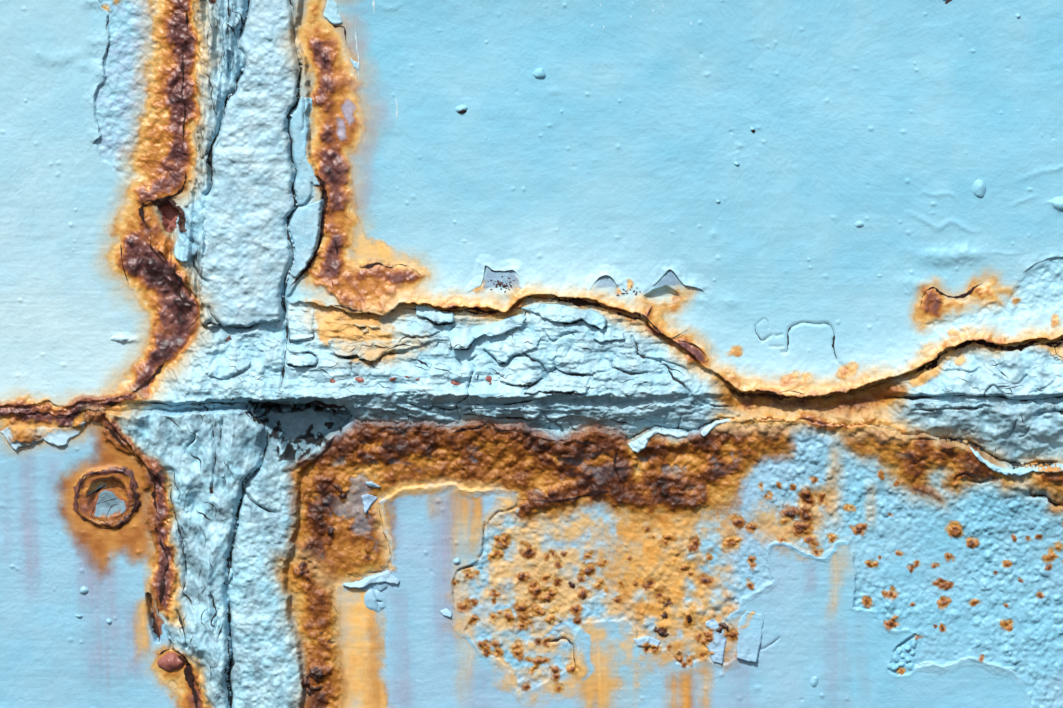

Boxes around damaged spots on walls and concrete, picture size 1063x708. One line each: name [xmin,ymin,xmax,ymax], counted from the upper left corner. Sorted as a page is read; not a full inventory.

peeling [286,96,324,278]
peeling [1012,246,1063,282]
rust [0,0,211,708]
peeling [208,351,251,380]
peeling [286,300,317,367]
peeling [328,303,625,395]
rust [280,0,1063,708]
crack [755,322,845,368]
peeling [461,407,541,421]
peeling [628,419,731,453]